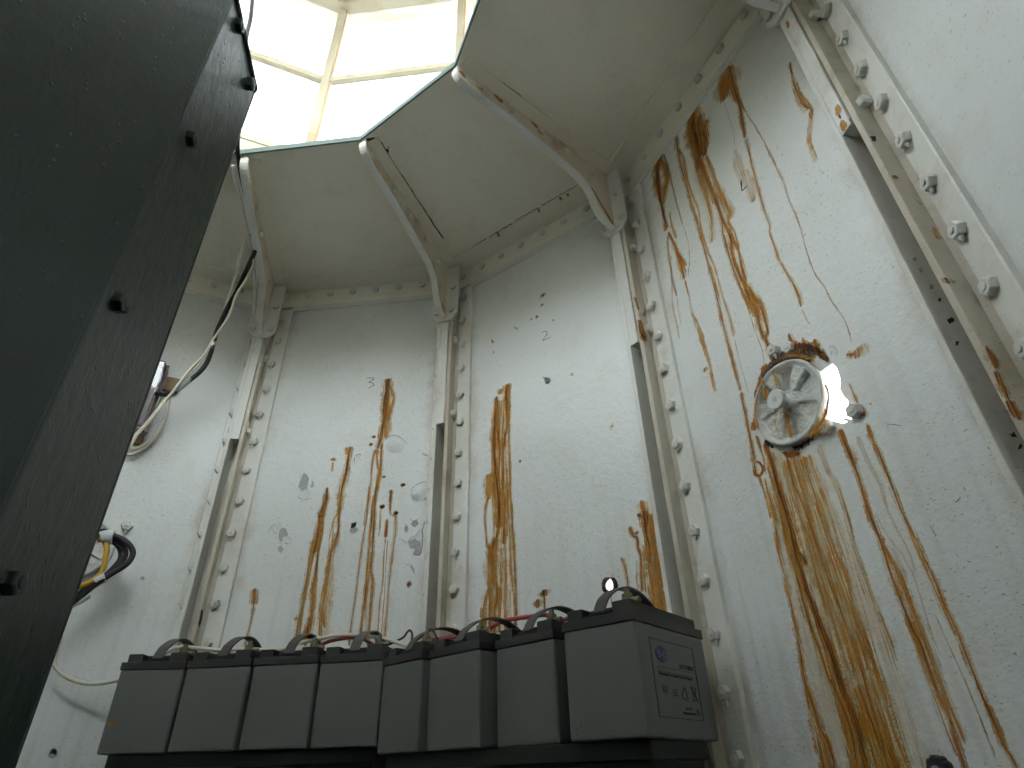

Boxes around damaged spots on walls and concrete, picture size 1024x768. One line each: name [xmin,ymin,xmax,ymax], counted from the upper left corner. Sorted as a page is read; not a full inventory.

rust [719,66,804,306]
rust [789,62,817,158]
rust [295,447,354,645]
rust [349,379,396,645]
rust [480,383,517,633]
rust [620,500,667,611]
rust [652,105,907,768]
rust [837,384,1017,768]
rust [986,347,1022,420]